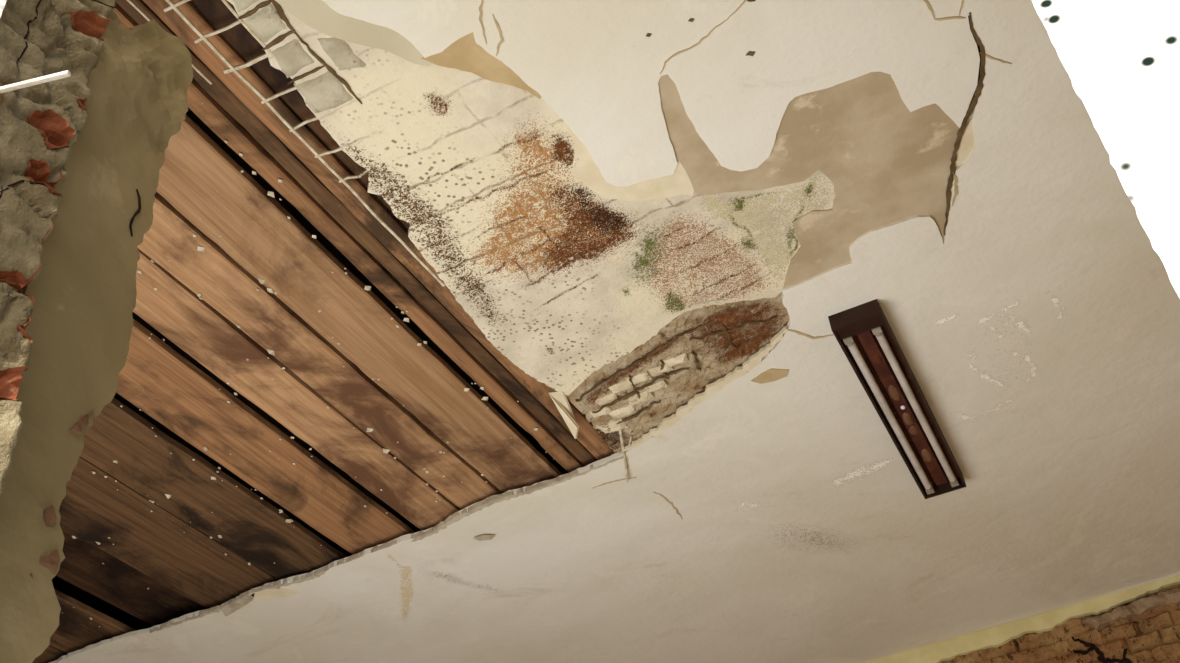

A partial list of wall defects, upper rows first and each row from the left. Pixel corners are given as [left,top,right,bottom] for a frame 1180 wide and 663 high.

flaking render [66,10,111,41]
crack [660,0,746,74]
flaking render [24,109,76,195]
crack [923,0,1012,236]
flaking render [0,264,42,303]
flaking render [227,0,975,542]
leakage [623,226,666,296]
leakage [665,292,685,313]
leakage [701,175,831,284]
flaking render [0,366,28,401]
peeling [149,540,397,633]
crack [1071,637,1132,663]